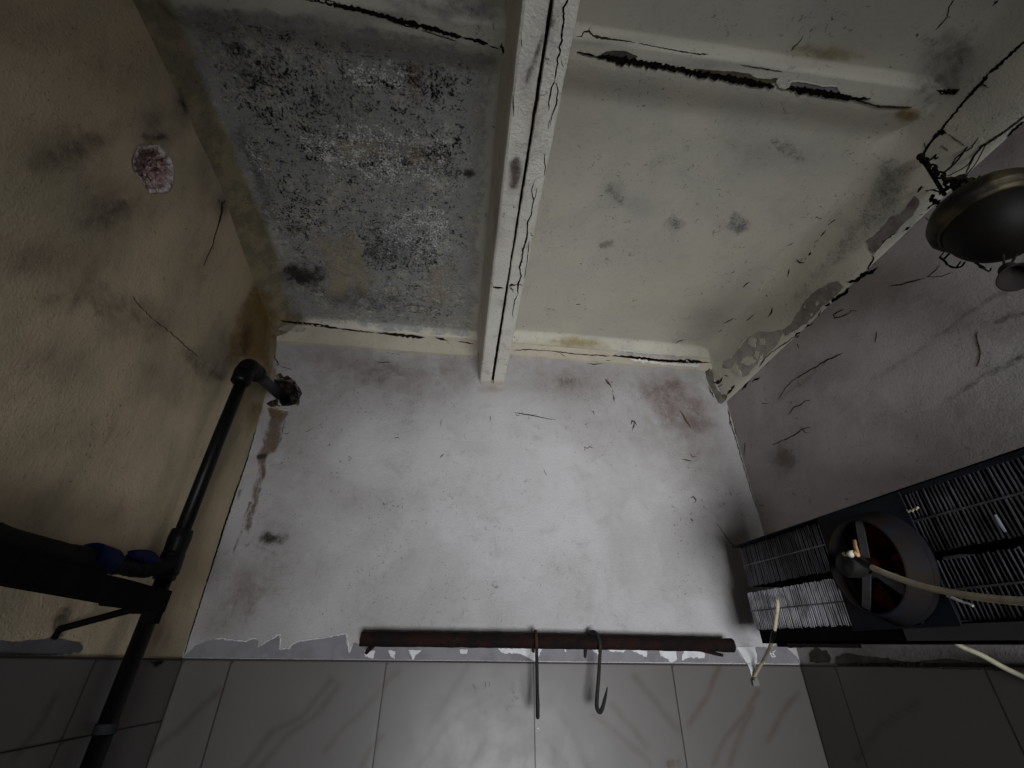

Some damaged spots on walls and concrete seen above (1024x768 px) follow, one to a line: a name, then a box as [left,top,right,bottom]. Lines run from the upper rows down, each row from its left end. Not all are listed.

crack [923,41,1024,173]
spalling [132,145,174,193]
crack [203,200,226,266]
damp [181,8,486,333]
crack [280,0,912,380]
peeling [866,196,920,253]
peeling [614,281,844,404]
crack [742,205,954,445]
peeling [183,633,1024,672]